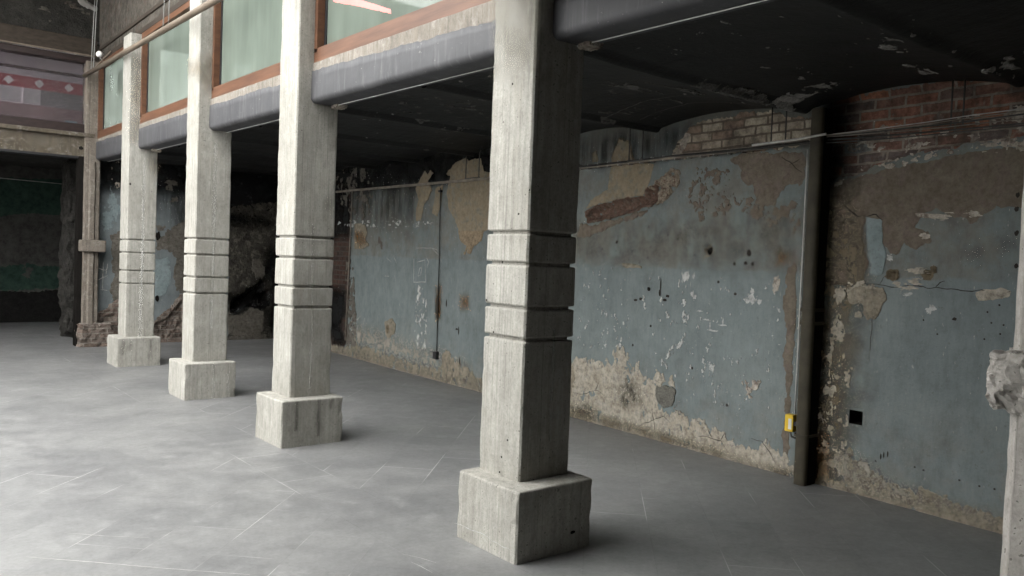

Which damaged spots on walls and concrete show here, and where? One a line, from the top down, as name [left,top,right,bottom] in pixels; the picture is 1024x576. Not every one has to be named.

peeling [577,67,840,238]
flaking render [330,158,490,393]
flaking render [570,263,797,477]
peeling [815,19,1024,534]
crack [864,277,984,292]